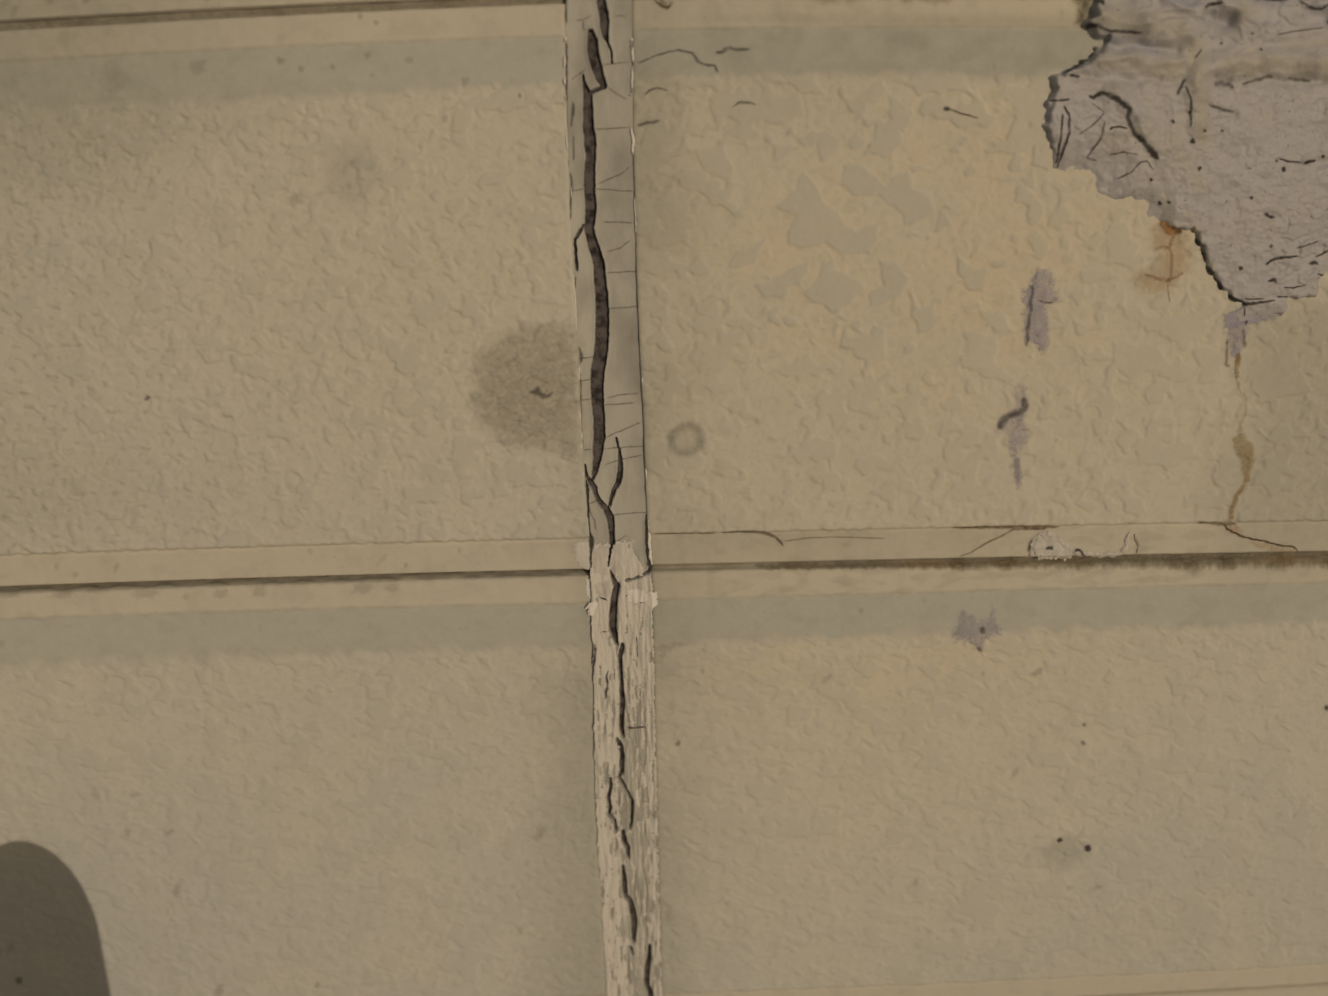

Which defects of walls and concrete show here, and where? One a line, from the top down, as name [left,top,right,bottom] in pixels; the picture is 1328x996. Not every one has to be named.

crack [566,0,653,996]